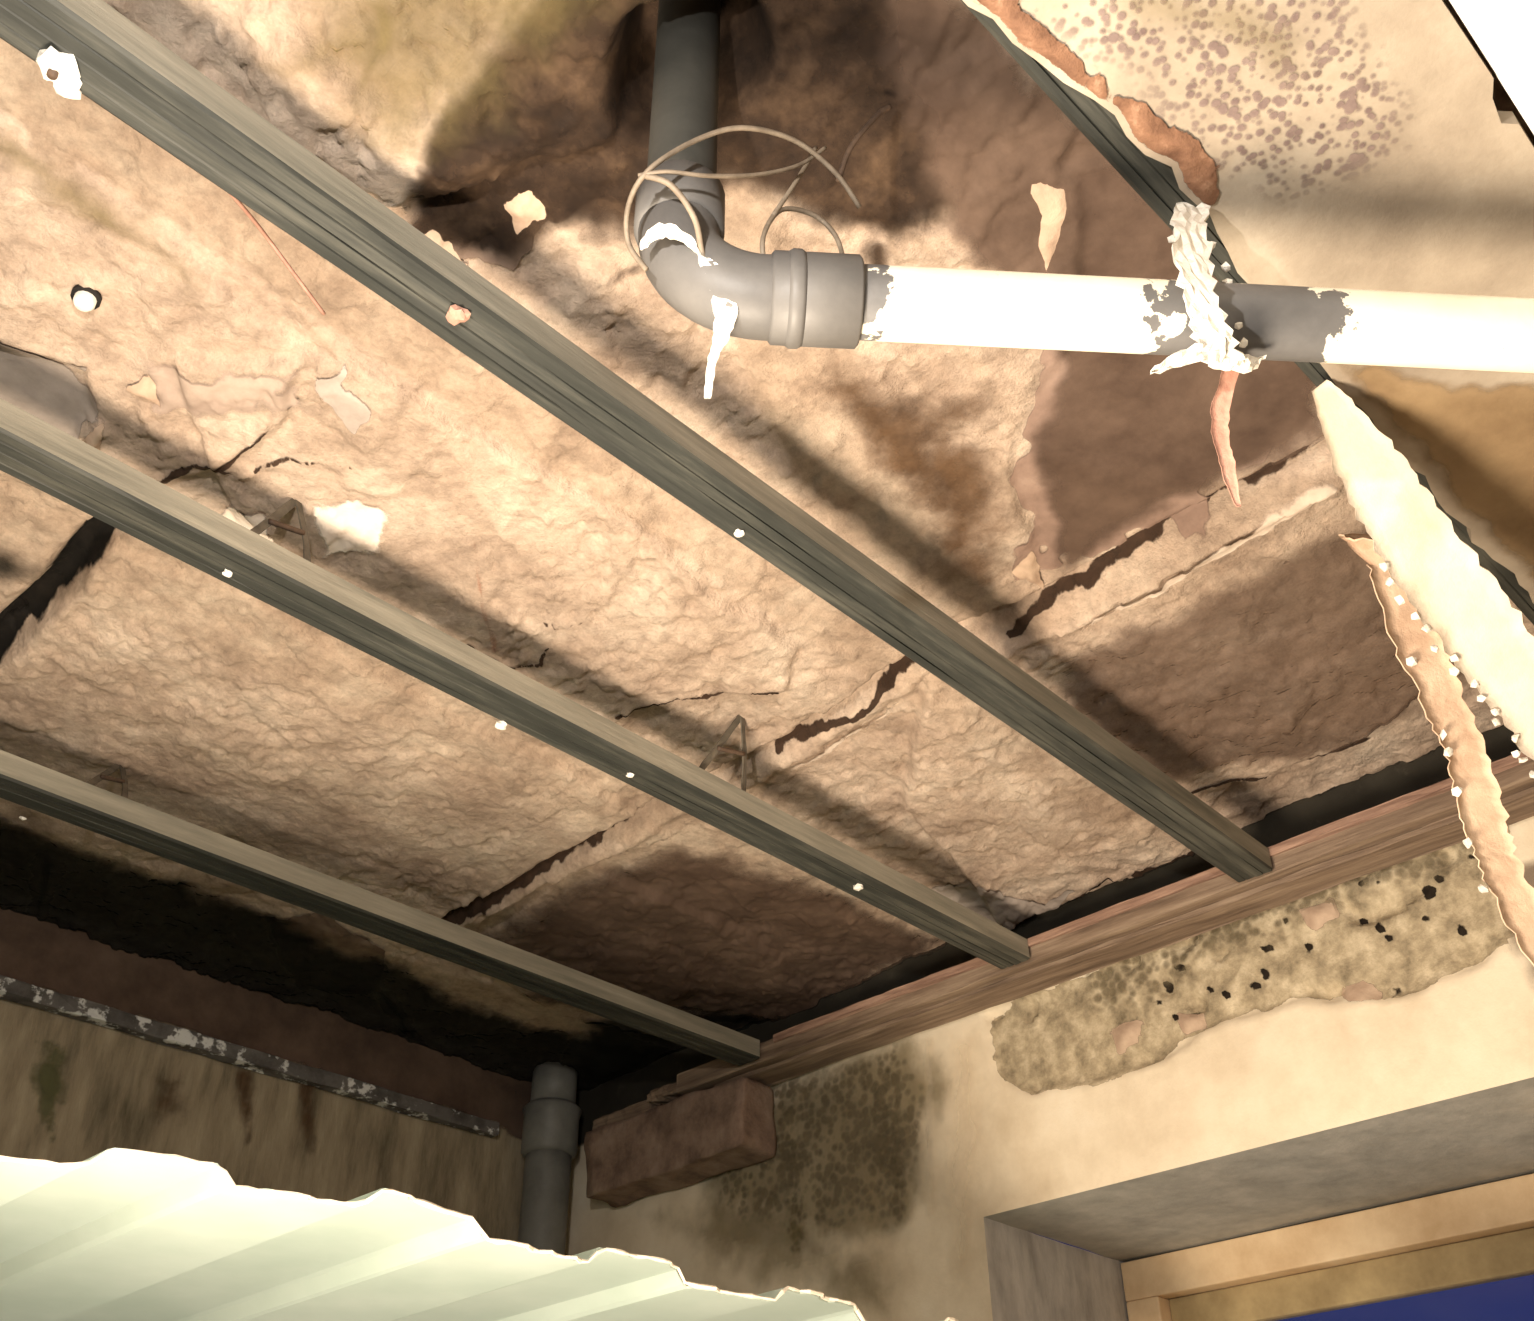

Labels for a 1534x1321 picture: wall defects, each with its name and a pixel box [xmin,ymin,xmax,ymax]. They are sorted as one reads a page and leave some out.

damp [1060,0,1393,181]
crack [1207,445,1309,502]
crack [0,517,115,662]
crack [1006,517,1171,638]
crack [775,656,915,755]
flaking render [990,533,1534,1095]
damp [1241,745,1451,847]
damp [1481,725,1520,762]
damp [0,820,717,1146]
damp [493,852,977,1043]
damp [1010,853,1215,939]
damp [1524,865,1534,888]